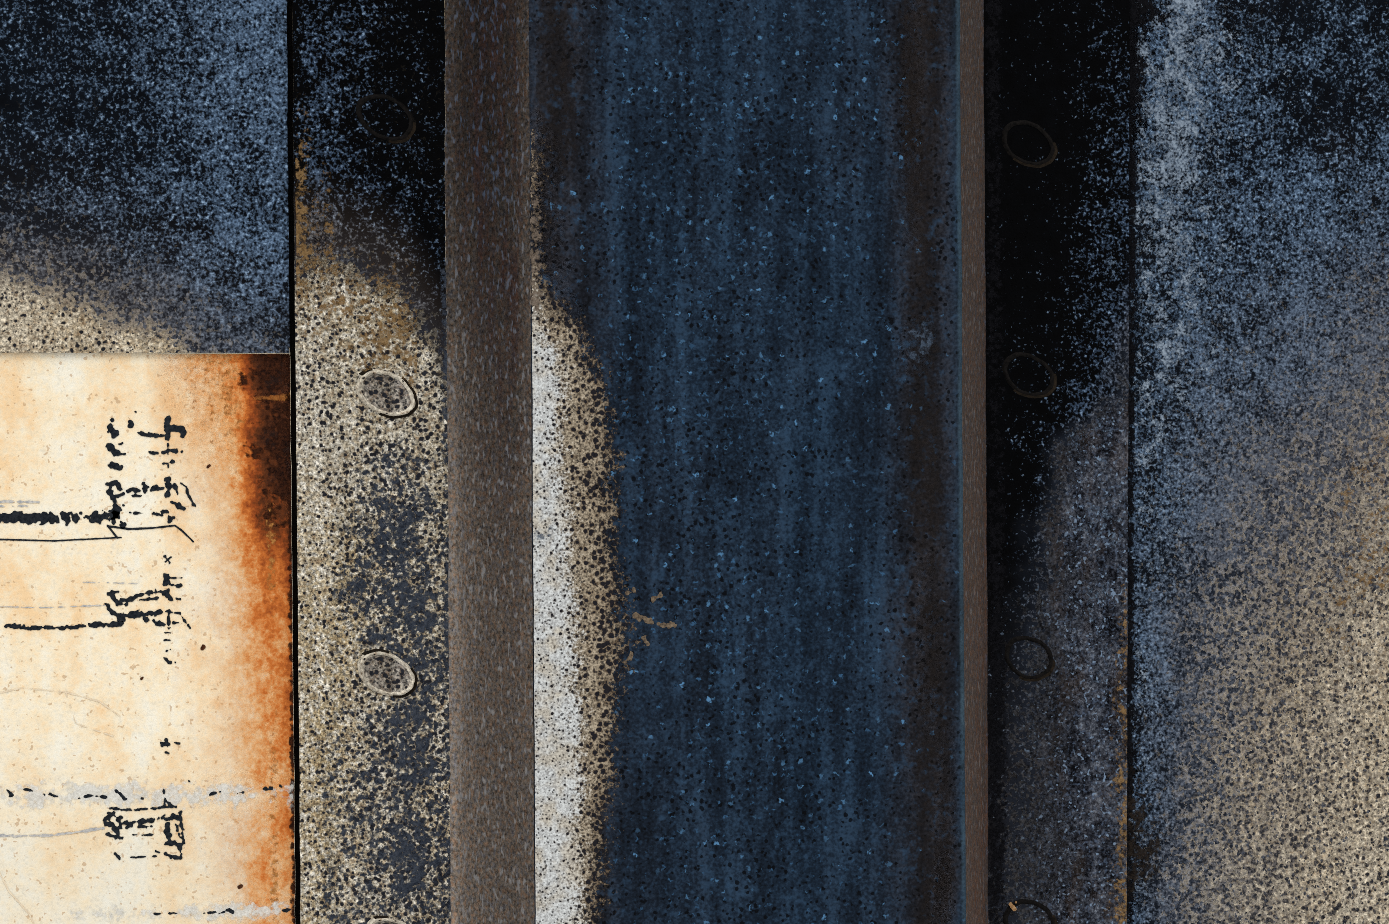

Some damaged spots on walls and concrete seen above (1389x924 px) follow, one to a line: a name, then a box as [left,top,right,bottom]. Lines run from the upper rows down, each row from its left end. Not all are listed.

corrosion [179,354,295,924]